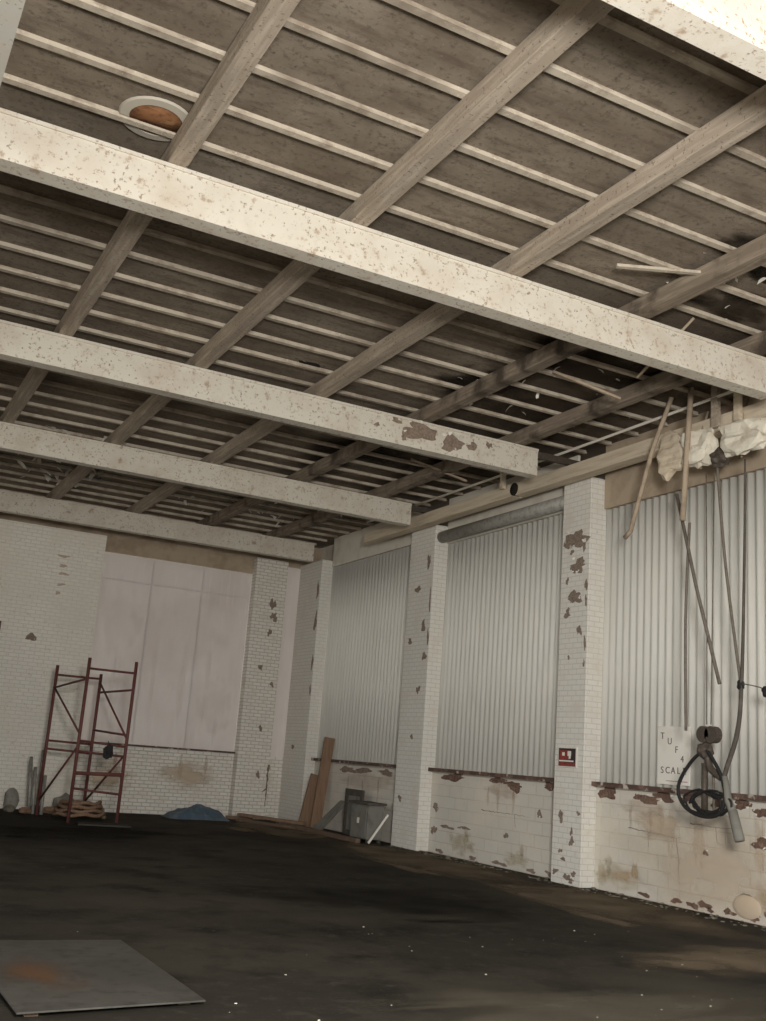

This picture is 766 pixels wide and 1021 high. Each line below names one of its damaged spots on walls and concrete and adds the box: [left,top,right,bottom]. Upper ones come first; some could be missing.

peeling [392,417,492,452]
peeling [563,528,591,618]
peeling [441,773,463,782]
peeling [489,777,522,794]
peeling [597,787,617,800]
peeling [633,792,674,805]
peeling [735,799,766,818]
peeling [430,824,470,834]
spalling [750,836,766,850]
spalling [670,898,737,916]